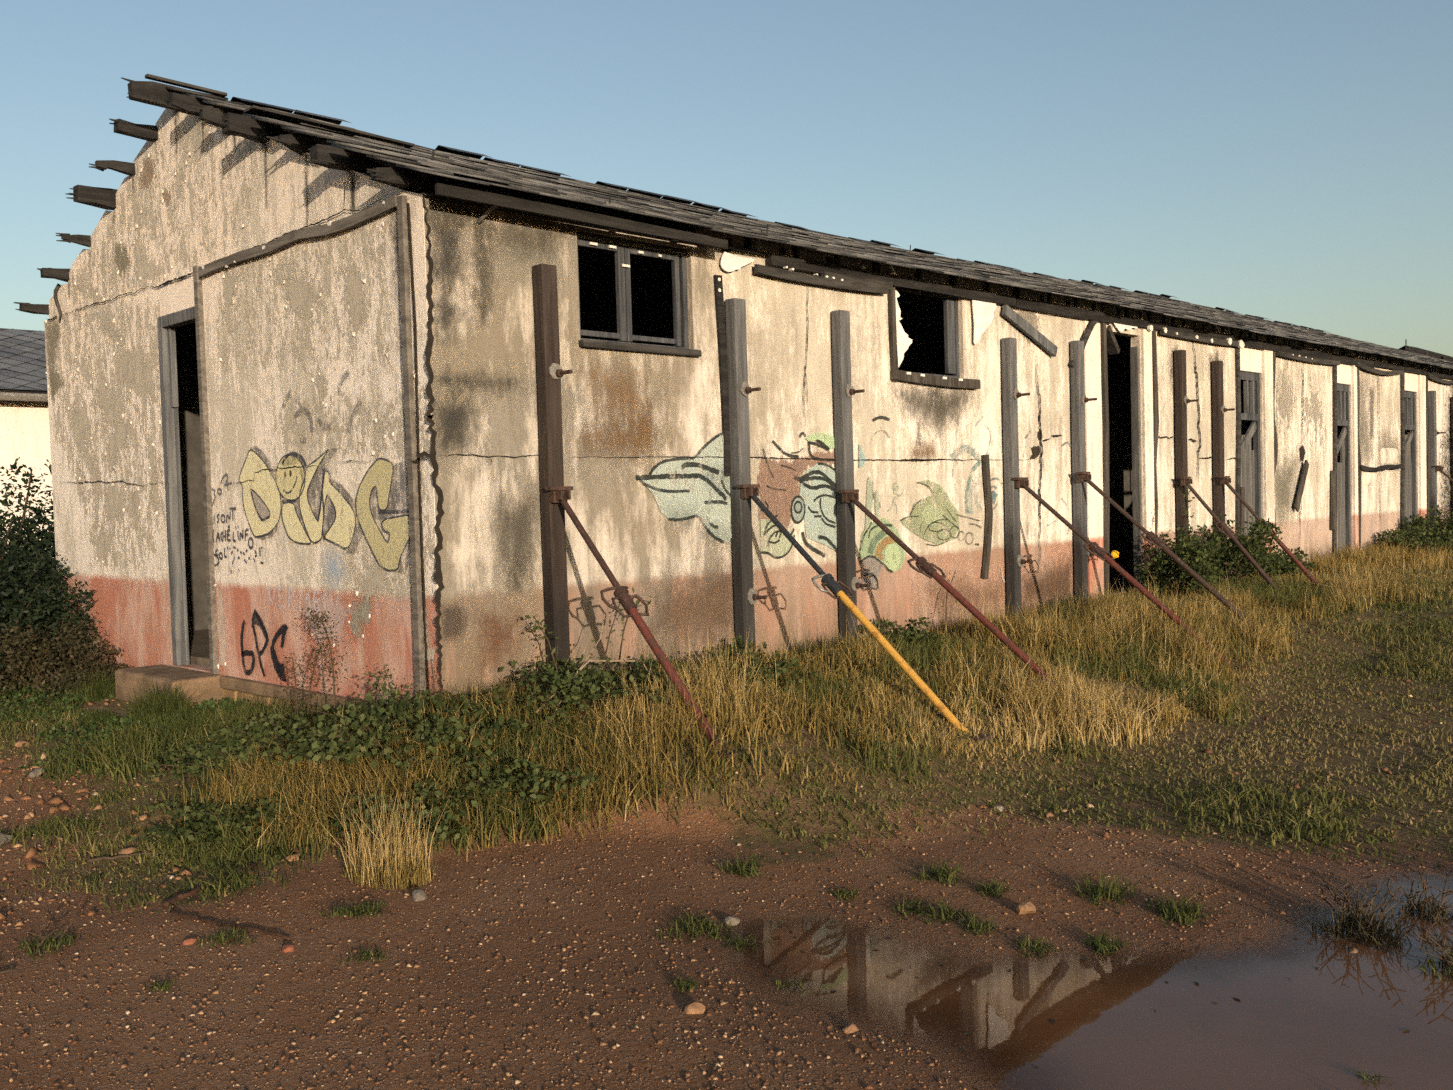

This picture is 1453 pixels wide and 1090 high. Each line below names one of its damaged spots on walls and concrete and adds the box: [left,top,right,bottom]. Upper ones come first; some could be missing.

peeling [44,117,436,669]
crack [231,460,358,484]
leakage [438,299,455,328]
leakage [433,203,468,277]
leakage [439,405,468,447]
crack [416,193,534,695]
leakage [477,239,492,316]
crack [802,301,810,409]
crack [588,364,1062,563]
leakage [504,503,530,588]